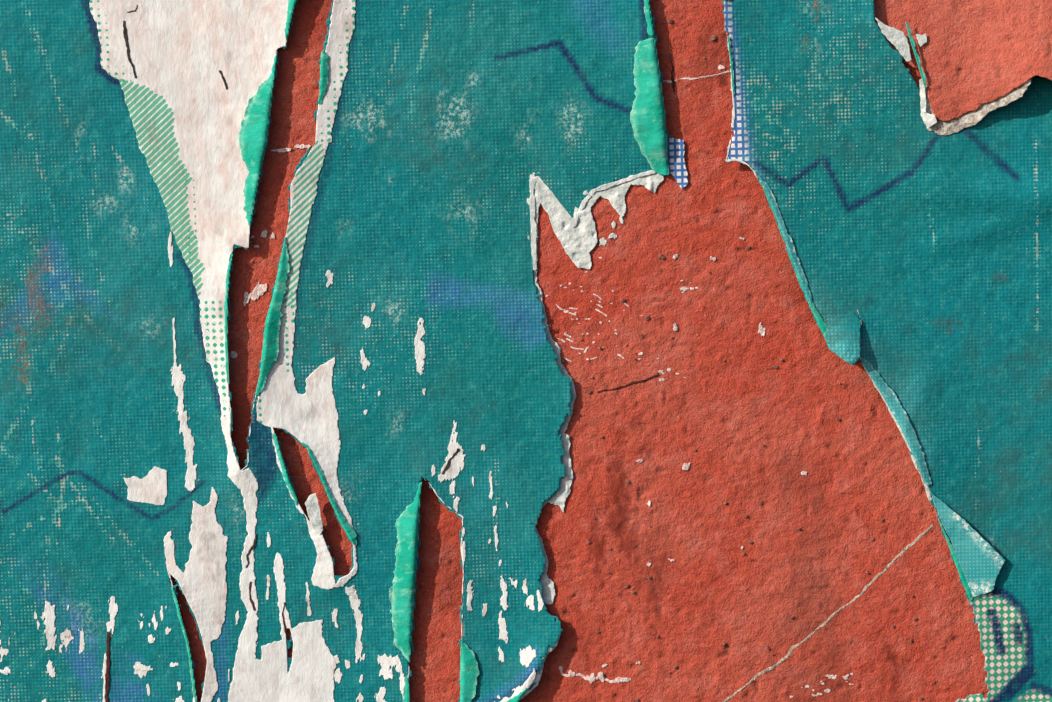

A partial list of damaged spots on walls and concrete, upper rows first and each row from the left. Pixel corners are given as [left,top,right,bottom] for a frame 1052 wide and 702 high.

peeling [875,18,937,129]
peeling [89,0,405,702]
peeling [414,318,426,375]
peeling [527,170,664,512]
crack [597,373,659,393]
peeling [0,621,15,675]
peeling [28,601,85,677]
crack [723,525,933,702]